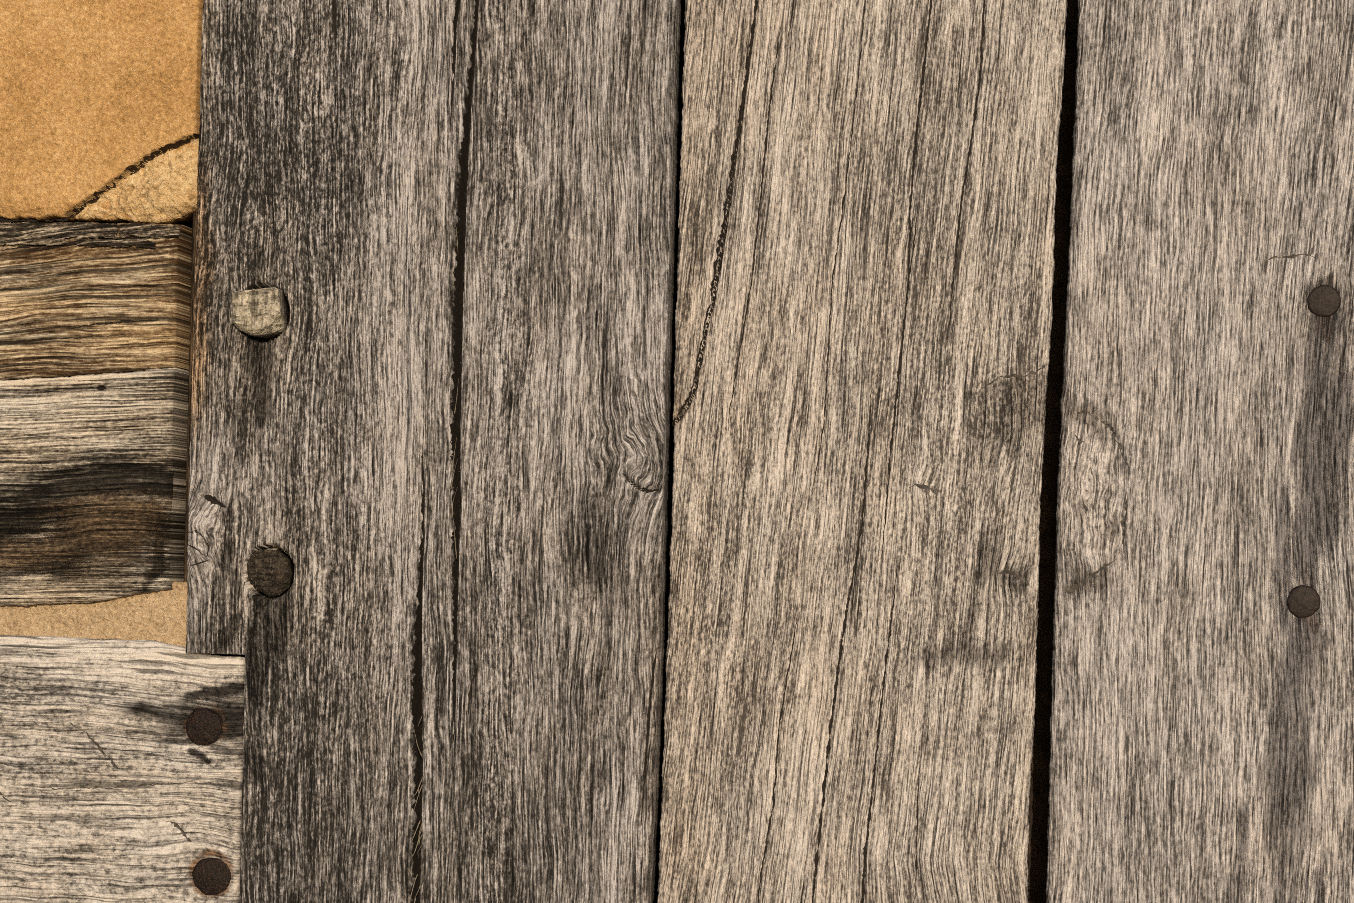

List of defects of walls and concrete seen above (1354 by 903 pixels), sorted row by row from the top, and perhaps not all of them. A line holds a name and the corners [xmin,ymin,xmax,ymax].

crack [672,0,794,426]